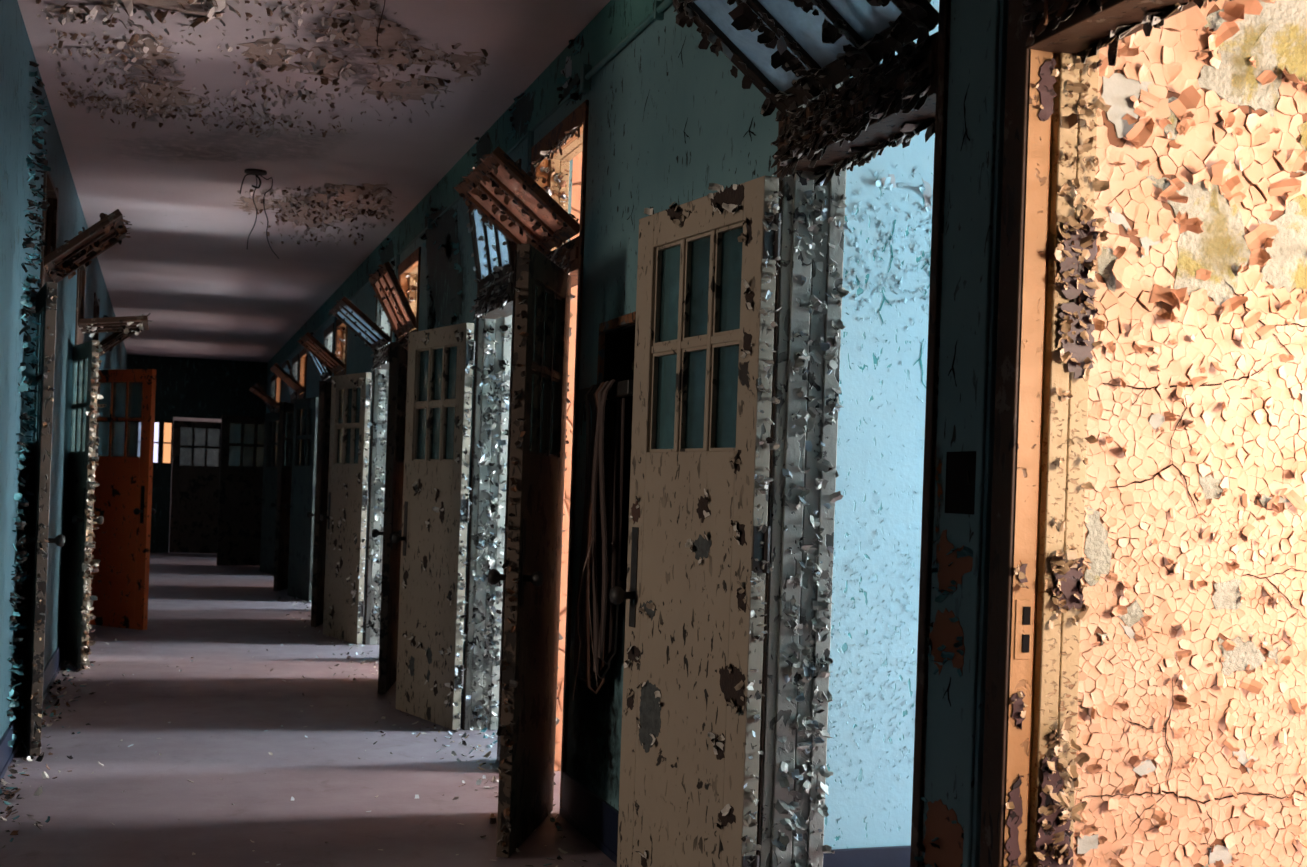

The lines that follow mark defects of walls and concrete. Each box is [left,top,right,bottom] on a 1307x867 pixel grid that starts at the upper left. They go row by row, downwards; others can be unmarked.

peeling [673,0,973,867]
peeling [1058,435,1098,469]
flaking render [1148,411,1178,433]
peeling [248,123,604,867]
flaking render [1199,473,1228,504]
peeling [1014,563,1028,588]
flaking render [1044,507,1118,630]
flaking render [1211,579,1243,611]
flaking render [1097,600,1144,645]
flaking render [1217,636,1278,689]
peeling [1005,699,1108,867]
flaking render [1132,757,1156,779]